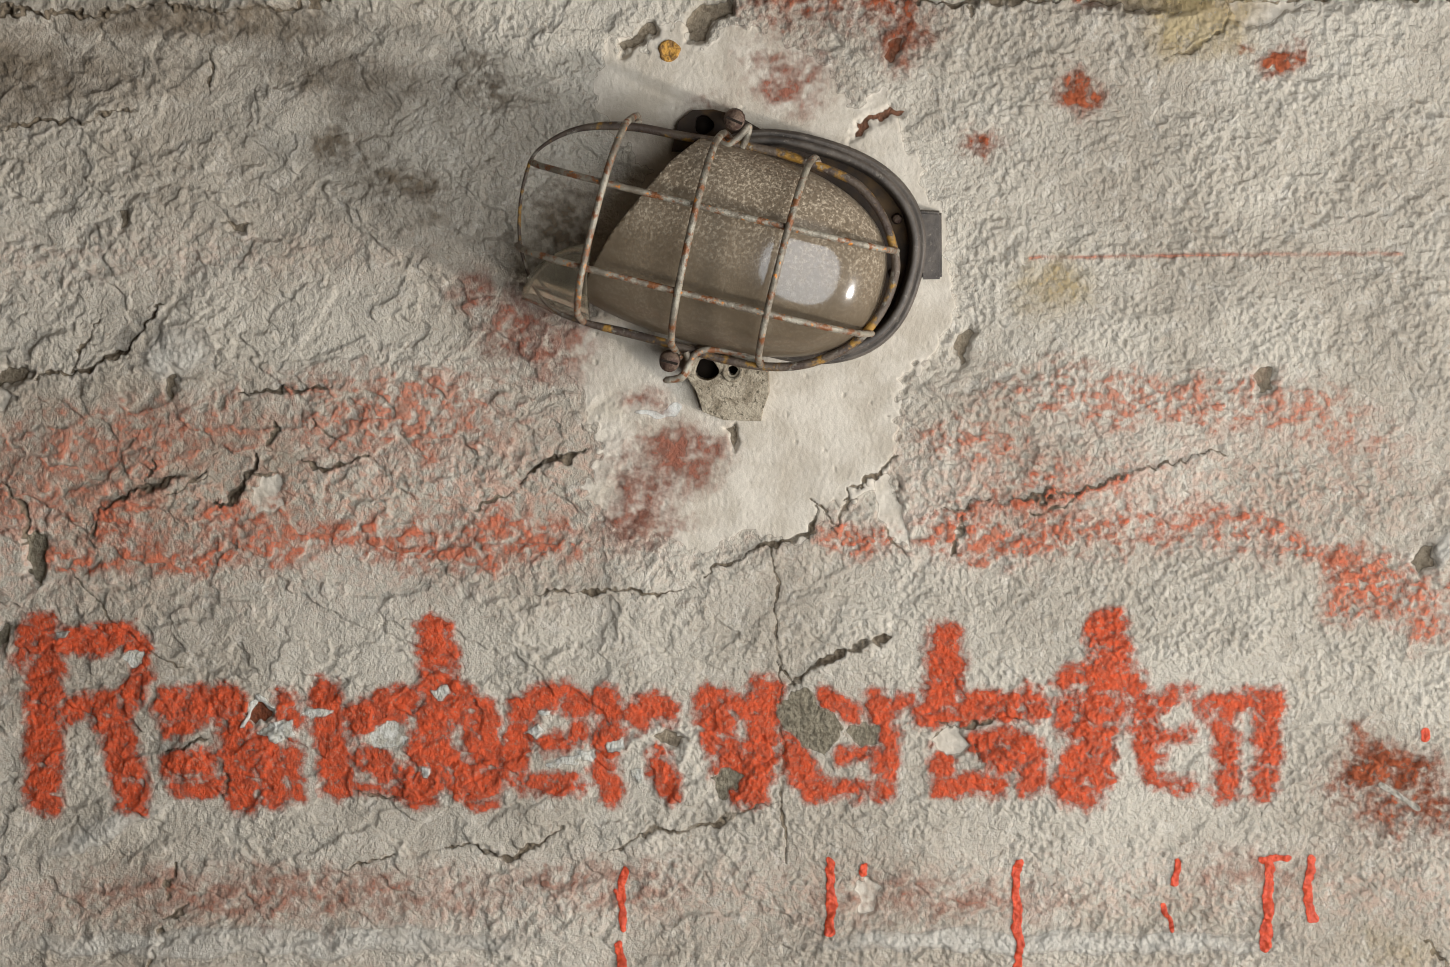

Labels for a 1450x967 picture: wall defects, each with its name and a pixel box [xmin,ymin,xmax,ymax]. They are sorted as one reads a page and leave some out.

crack [0,0,331,21]
flaking render [620,22,657,57]
flaking render [686,0,733,42]
flaking render [884,38,902,63]
flaking render [855,107,904,137]
crack [35,303,164,381]
flaking render [727,425,737,449]
crack [89,384,369,537]
crack [474,450,585,512]
flaking render [874,473,911,548]
crack [541,455,898,864]
crack [445,825,564,863]